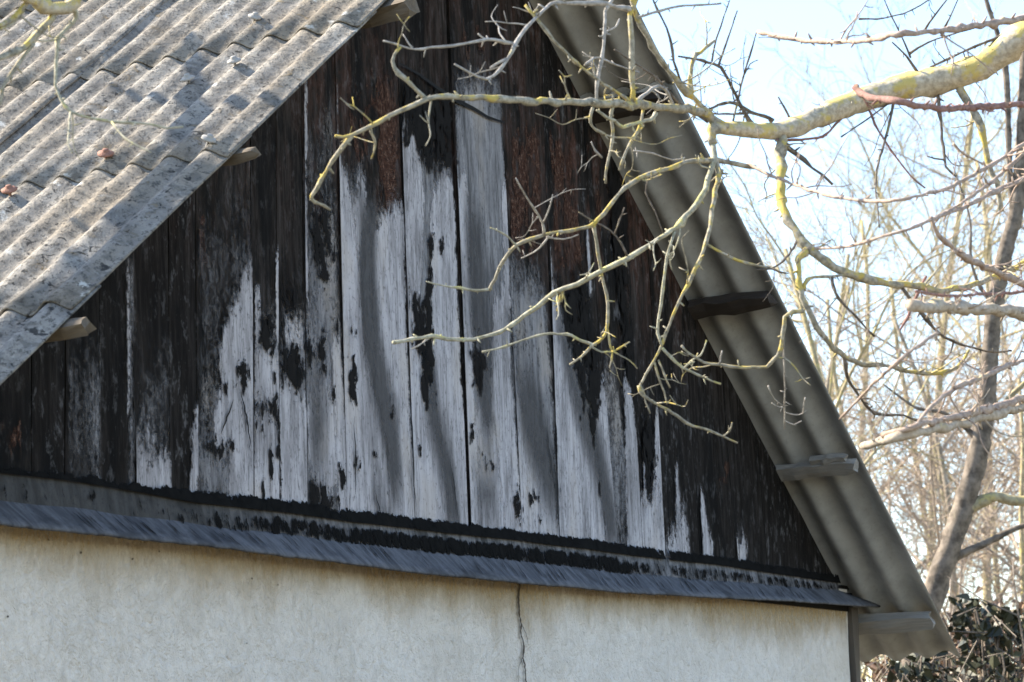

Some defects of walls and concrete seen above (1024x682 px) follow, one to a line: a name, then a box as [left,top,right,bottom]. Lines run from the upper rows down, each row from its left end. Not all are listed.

peeling [0,71,841,590]
crack [518,584,528,682]